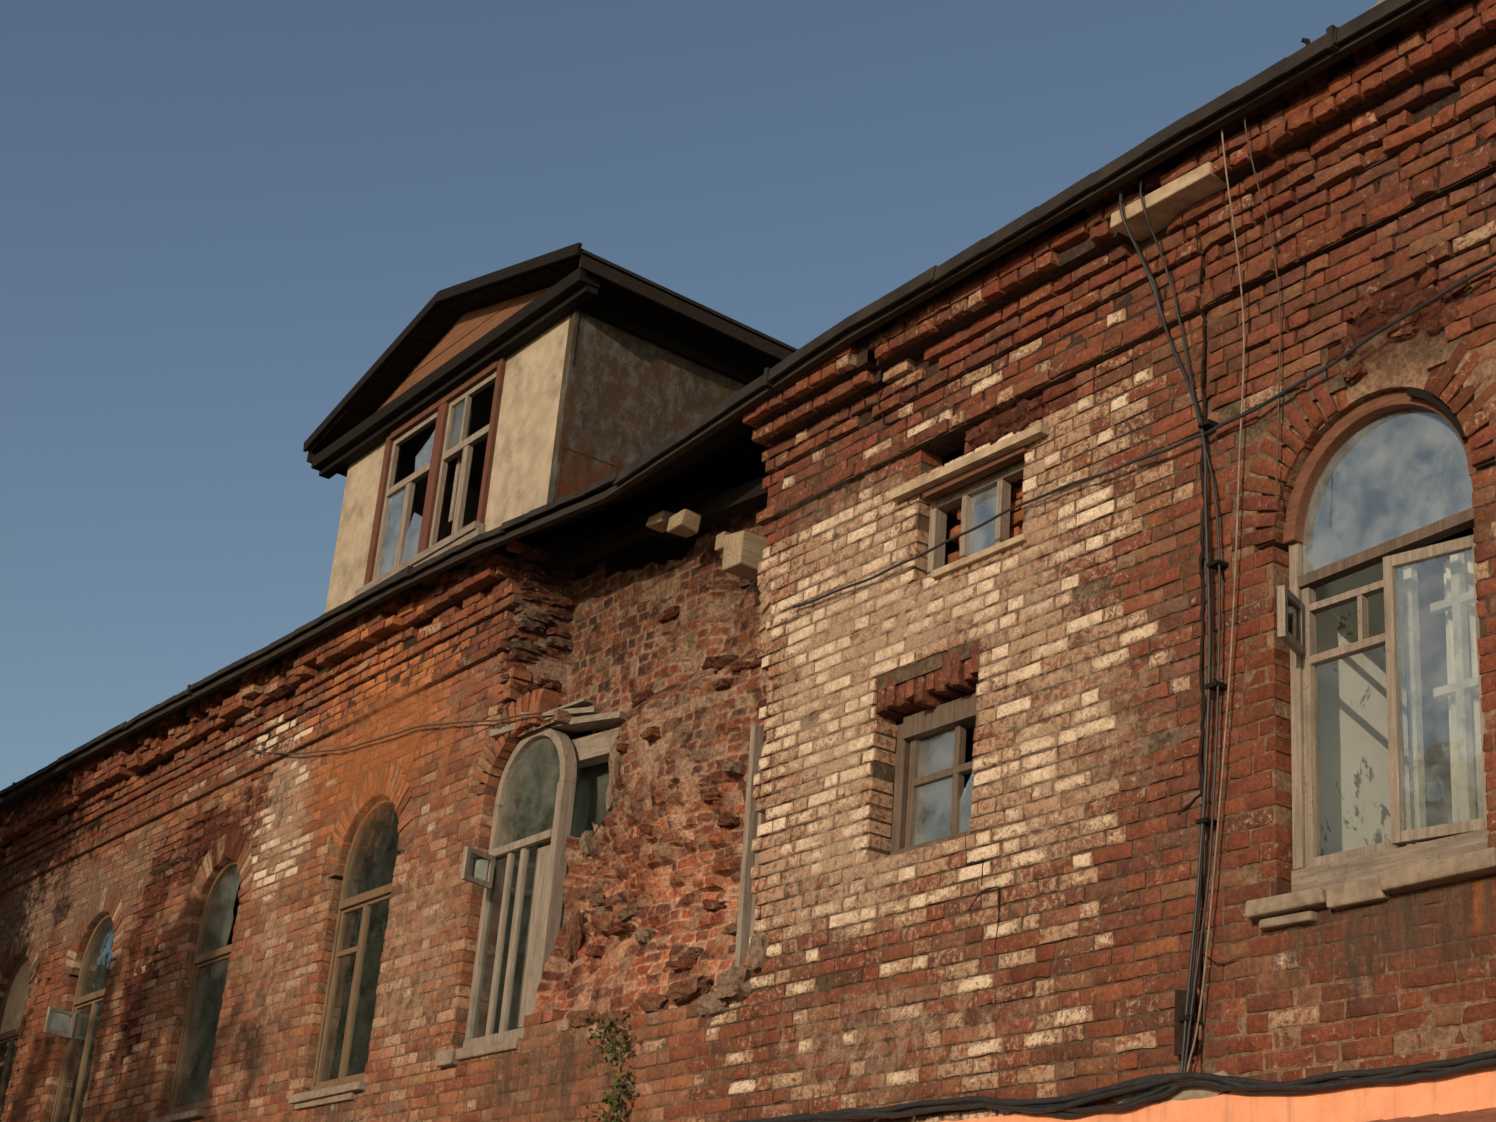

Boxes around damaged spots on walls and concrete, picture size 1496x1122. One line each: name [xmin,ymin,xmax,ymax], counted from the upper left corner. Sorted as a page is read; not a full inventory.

spalling [488,369,1162,1039]
peeling [1023,1006,1091,1048]
peeling [943,1027,1001,1088]
peeling [728,1079,756,1094]
peeling [776,1072,854,1107]
peeling [886,1070,918,1085]
peeling [916,1110,1013,1122]